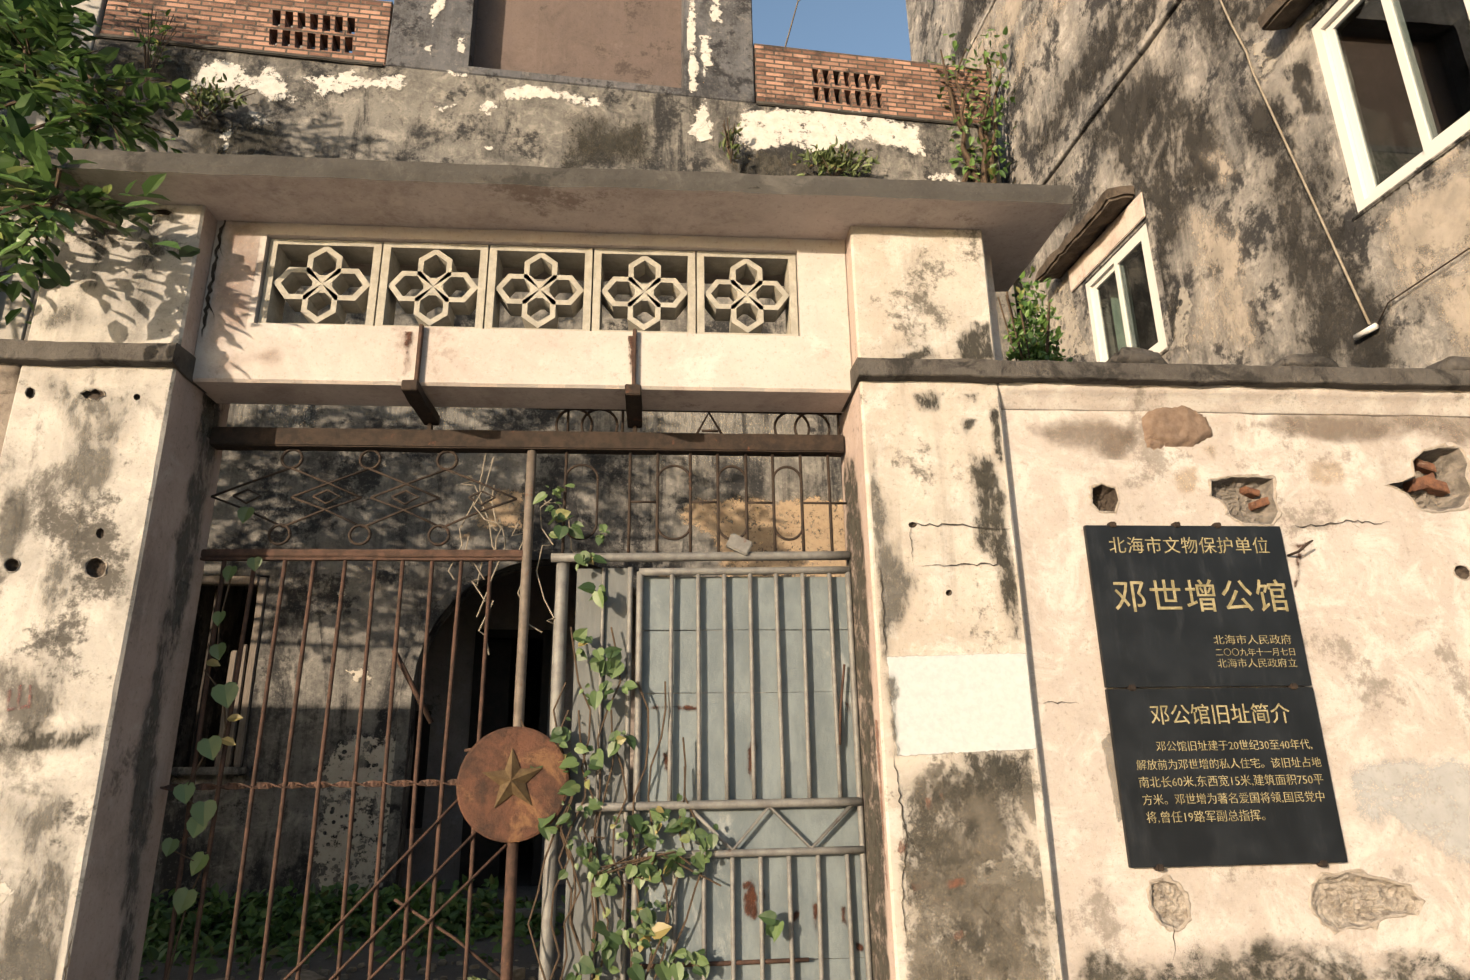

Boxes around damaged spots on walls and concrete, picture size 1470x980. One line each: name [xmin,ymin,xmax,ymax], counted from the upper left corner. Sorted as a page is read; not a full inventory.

peeling [429,0,445,27]
peeling [480,84,601,116]
mould [1030,0,1236,349]
mould [1241,61,1397,368]
spalling [1208,474,1283,526]
spalling [1384,443,1470,514]
water stain [0,692,97,755]
water stain [843,460,1050,980]
water stain [0,798,69,980]
flaking render [1146,873,1192,932]
flaking render [1308,868,1426,935]
water stain [1080,940,1470,980]